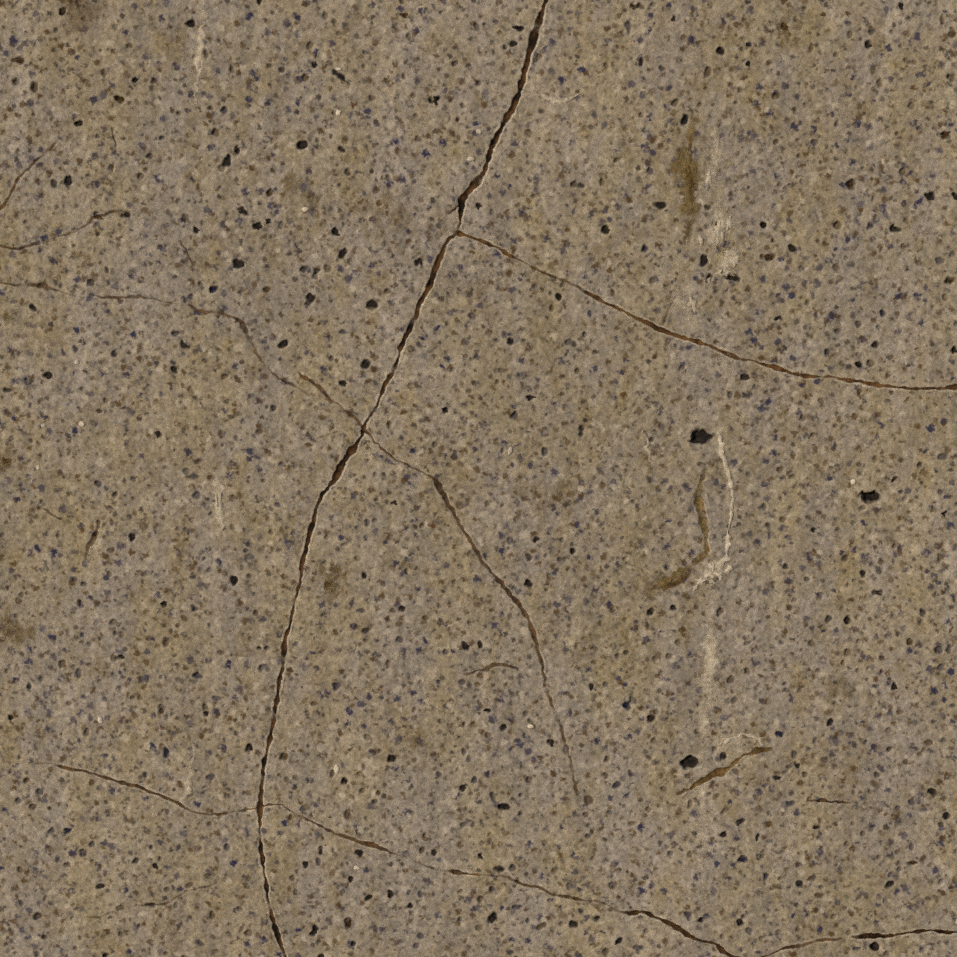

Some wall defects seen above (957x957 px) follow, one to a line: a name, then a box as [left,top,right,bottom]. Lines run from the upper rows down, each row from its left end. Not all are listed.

crack [0,242,37,250]
crack [0,282,56,291]
crack [577,286,957,392]
crack [56,0,582,957]
crack [656,472,709,589]
damp [693,431,735,733]
damp [698,755,707,821]
crack [676,747,772,795]
crack [807,797,849,805]
crack [621,909,957,957]